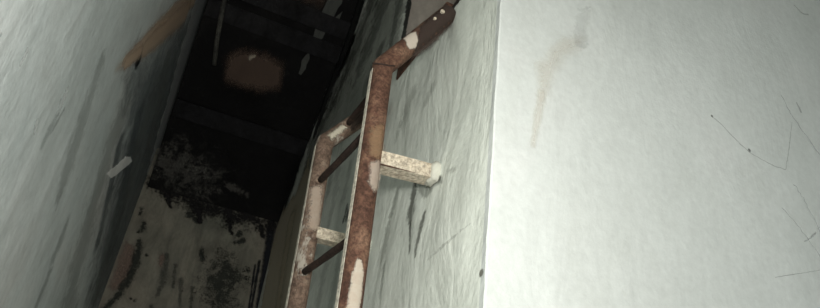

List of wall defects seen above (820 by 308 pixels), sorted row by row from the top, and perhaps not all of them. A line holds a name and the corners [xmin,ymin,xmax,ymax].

damp [194,156,309,308]